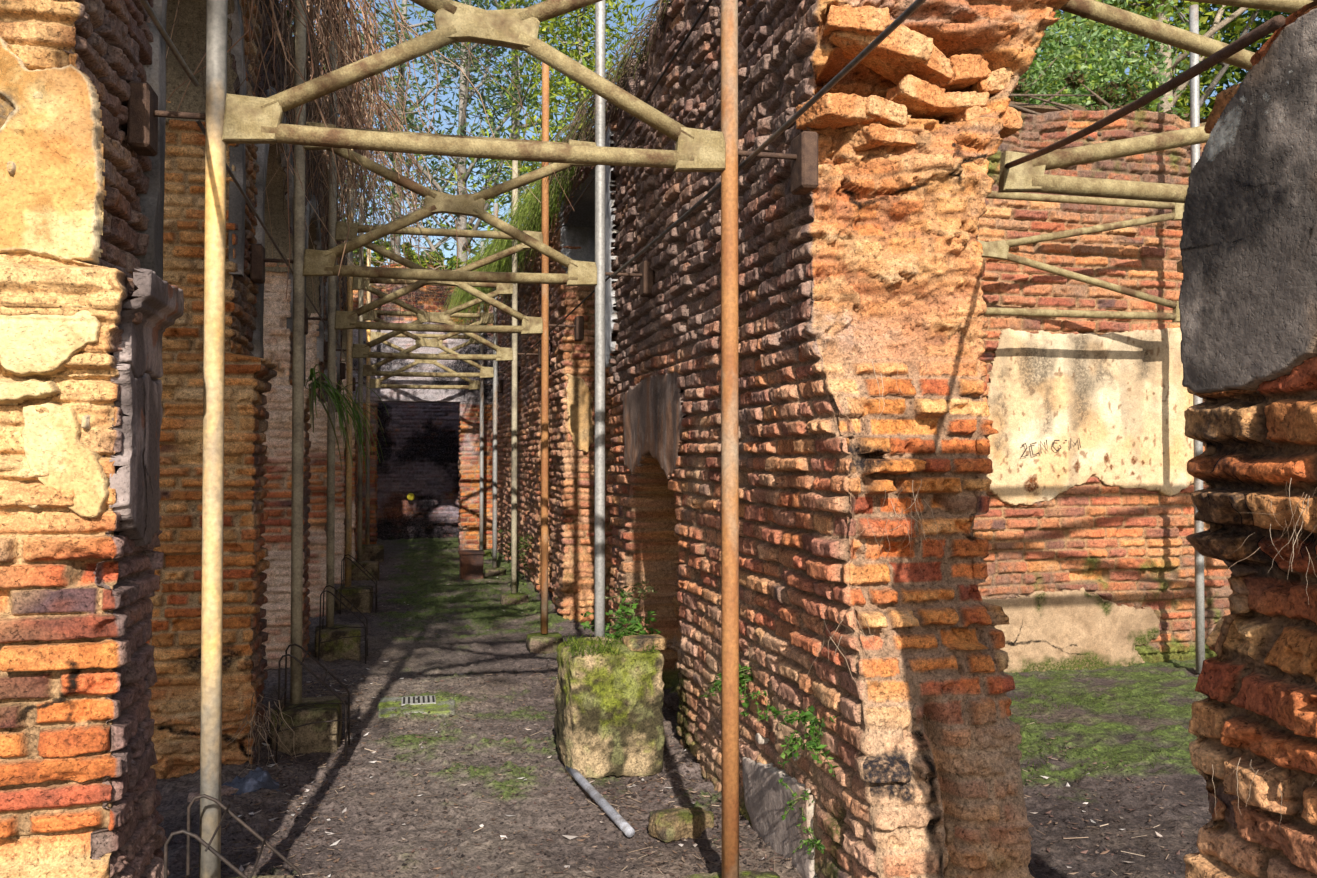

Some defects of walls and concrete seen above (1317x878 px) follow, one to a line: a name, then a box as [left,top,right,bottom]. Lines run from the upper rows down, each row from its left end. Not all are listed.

flaking render [227,0,246,96]
spalling [796,4,1023,152]
flaking render [0,0,184,547]
flaking render [987,8,1317,506]
flaking render [982,587,1160,673]